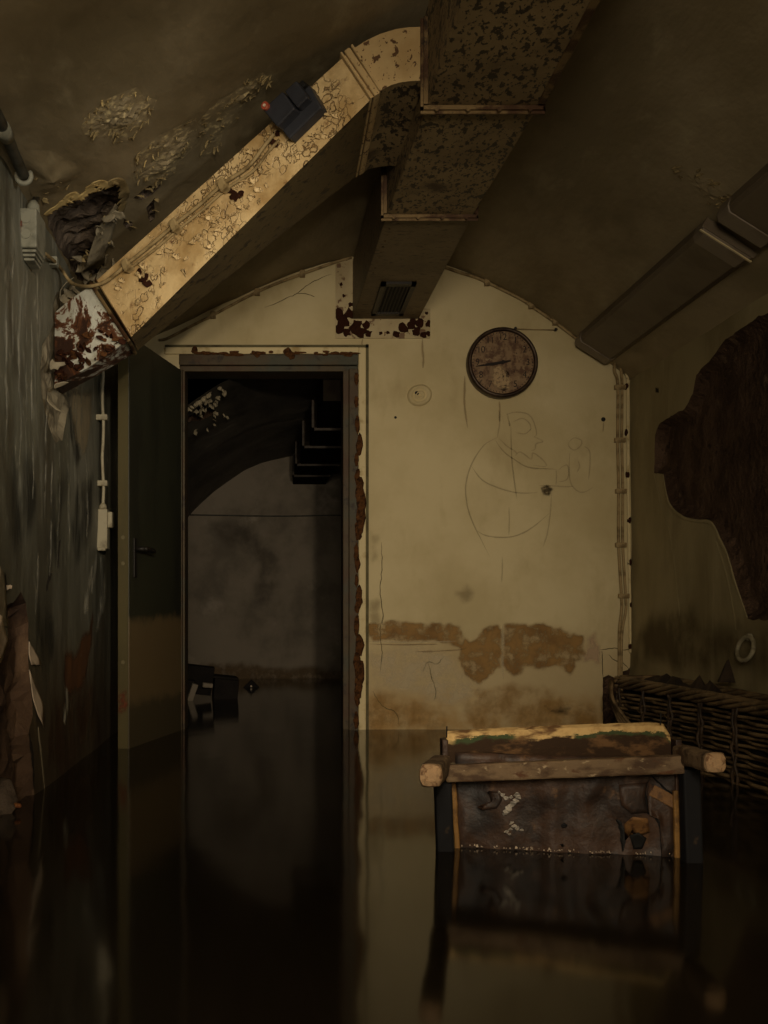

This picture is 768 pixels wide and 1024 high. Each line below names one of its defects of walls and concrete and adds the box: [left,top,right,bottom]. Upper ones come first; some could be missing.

rust [54,319,126,381]
peeling [40,72,273,442]
rust [191,346,360,360]
rust [353,373,367,729]
rust [336,282,430,338]
spalling [654,313,768,628]